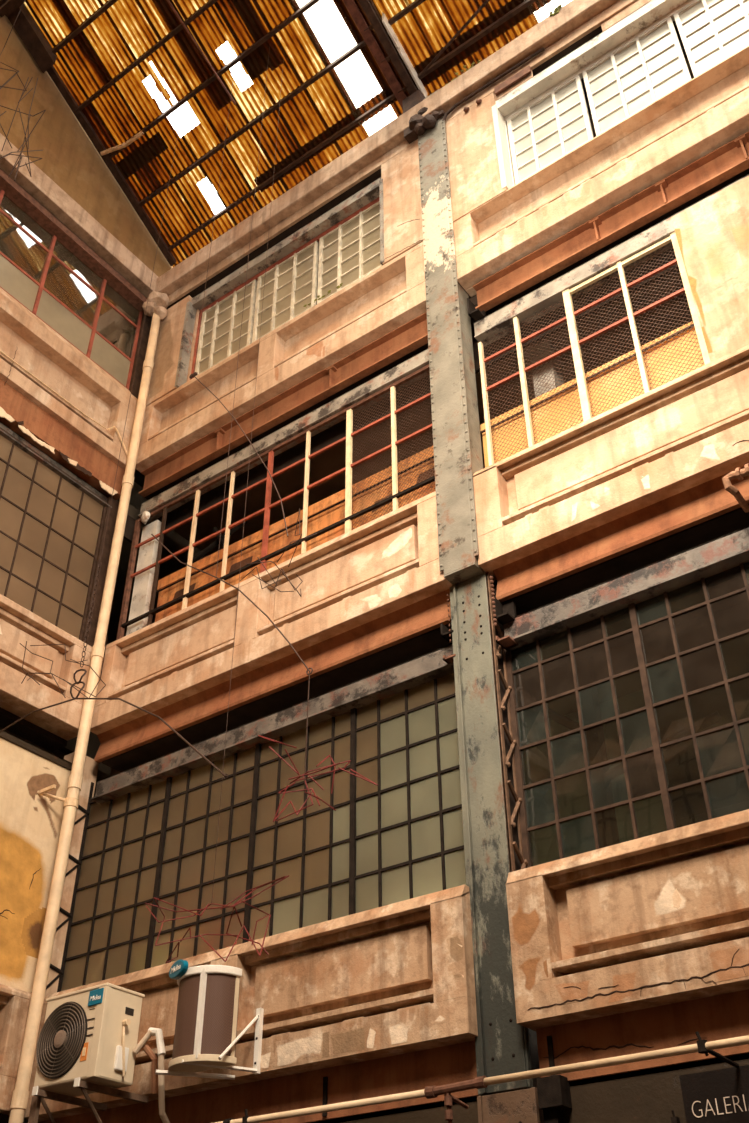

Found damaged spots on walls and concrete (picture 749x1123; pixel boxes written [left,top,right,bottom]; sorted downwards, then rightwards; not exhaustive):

damp [0,816,53,992]
crack [528,949,749,1010]